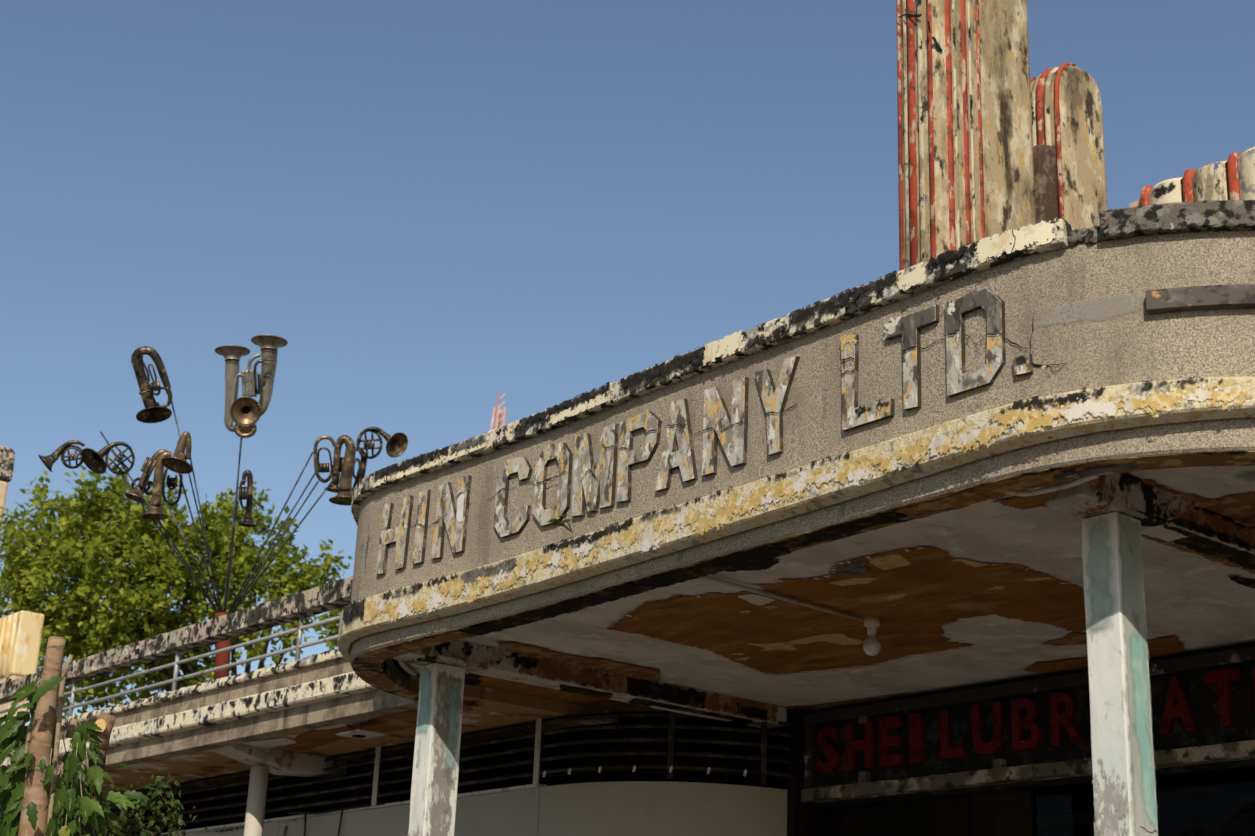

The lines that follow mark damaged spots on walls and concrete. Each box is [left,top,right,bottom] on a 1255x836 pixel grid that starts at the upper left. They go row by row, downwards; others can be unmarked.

peeling [975,217,1059,263]
peeling [896,264,927,291]
peeling [703,330,743,365]
peeling [840,333,857,350]
peeling [883,316,901,339]
crack [902,315,1067,376]
peeling [362,385,1252,625]
peeling [243,470,1099,751]
peeling [1092,474,1255,836]